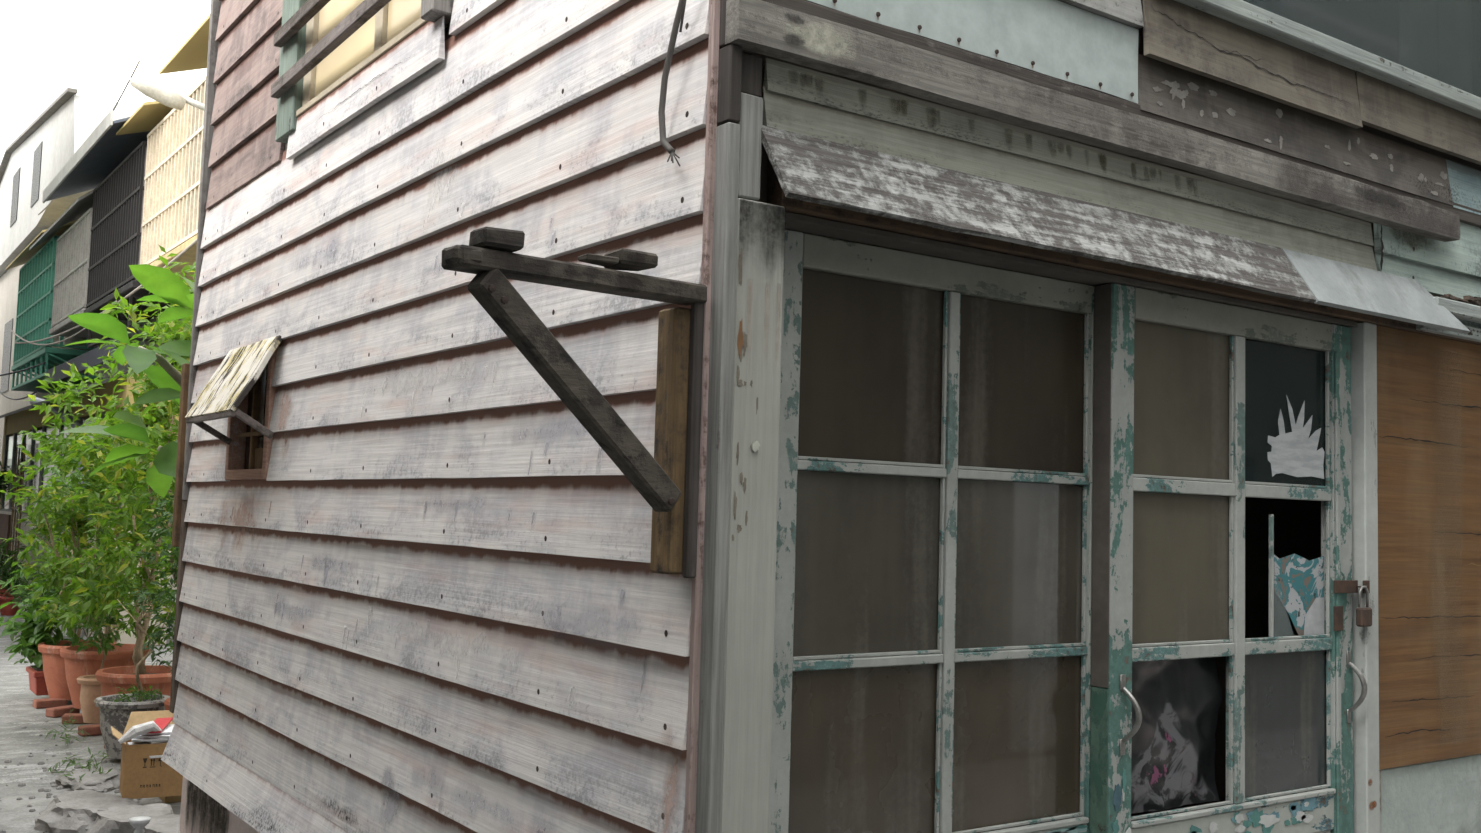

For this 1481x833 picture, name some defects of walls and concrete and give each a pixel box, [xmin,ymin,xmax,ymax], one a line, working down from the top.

peeling [1153,80,1236,118]
peeling [1343,137,1393,172]
leakage [186,781,229,833]
peeling [1046,824,1089,833]
peeling [1190,797,1318,833]